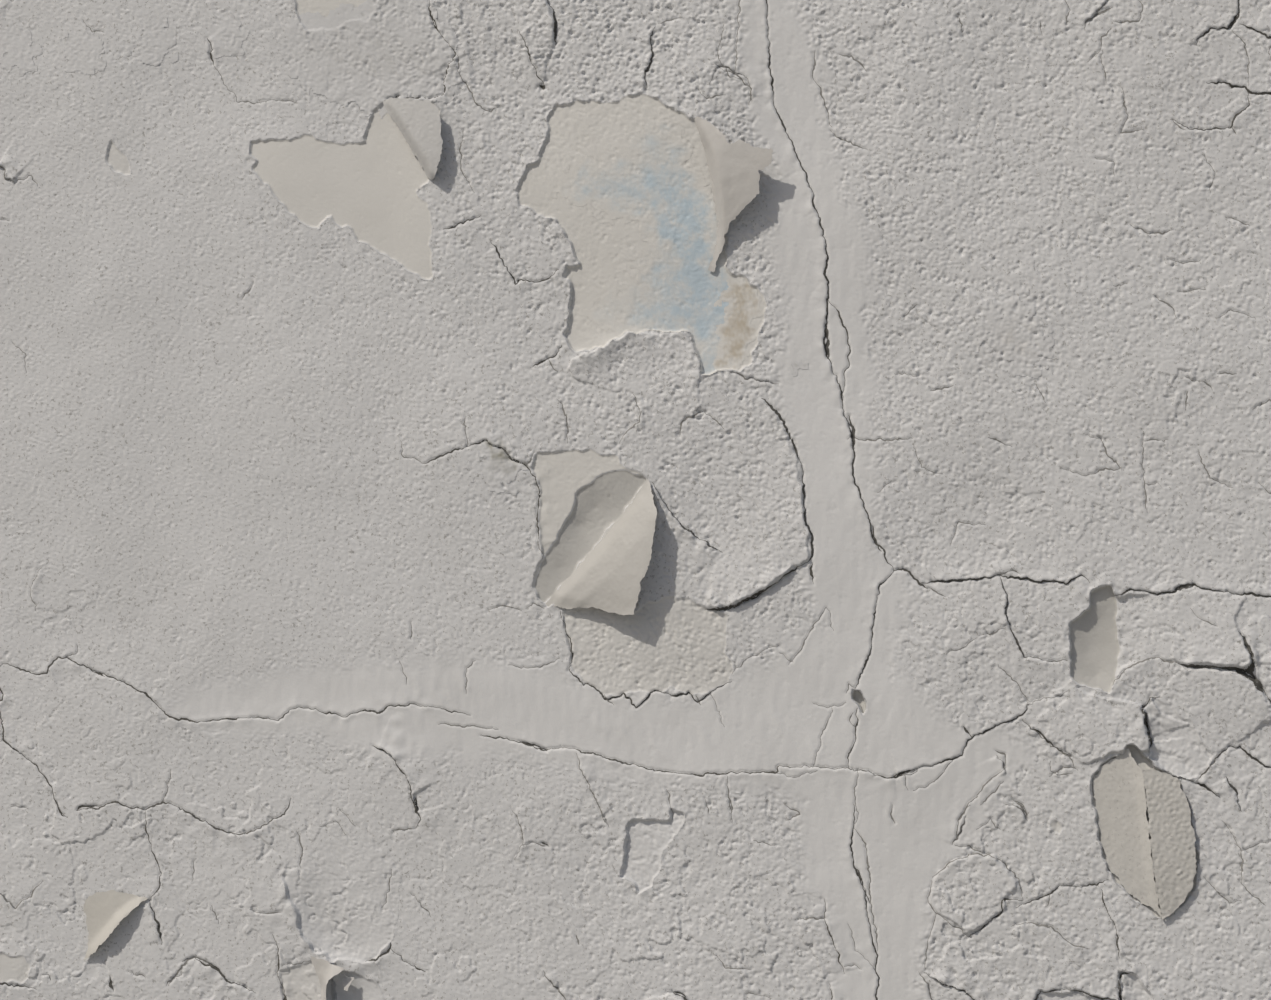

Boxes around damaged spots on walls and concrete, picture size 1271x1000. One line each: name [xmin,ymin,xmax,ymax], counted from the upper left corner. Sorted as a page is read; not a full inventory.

crack [1040,0,1271,190]
peeling [516,93,773,375]
crack [766,0,1090,692]
peeling [531,448,735,697]
crack [489,371,834,727]
flaking render [1068,585,1120,694]
crack [1113,583,1271,702]
peeling [83,890,148,960]
flaking render [278,838,402,1000]
crack [0,647,1078,1000]
crack [918,750,1133,1000]
peeling [1089,698,1212,920]